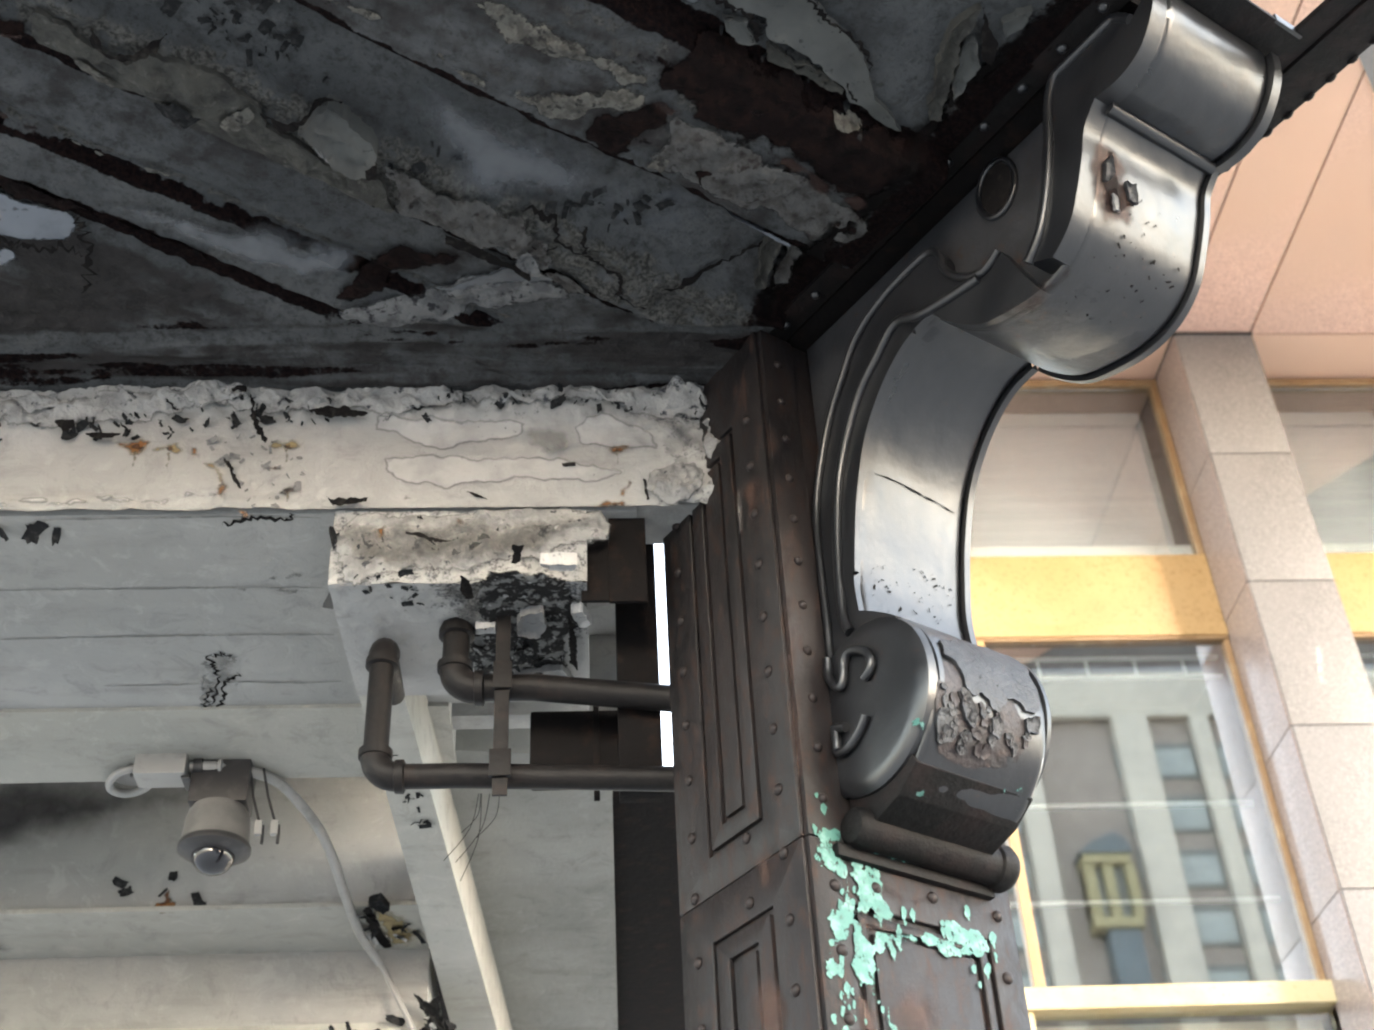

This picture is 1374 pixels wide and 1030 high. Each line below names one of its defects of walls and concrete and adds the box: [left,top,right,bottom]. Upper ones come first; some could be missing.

peeling [0,193,76,265]
flaking render [31,0,552,281]
peeling [531,181,675,233]
crack [514,204,763,309]
flaking render [647,116,868,290]
peeling [719,0,901,141]
rust [1092,144,1138,222]
spalling [0,380,720,677]
peeling [872,566,1041,769]
peeling [814,827,990,1030]